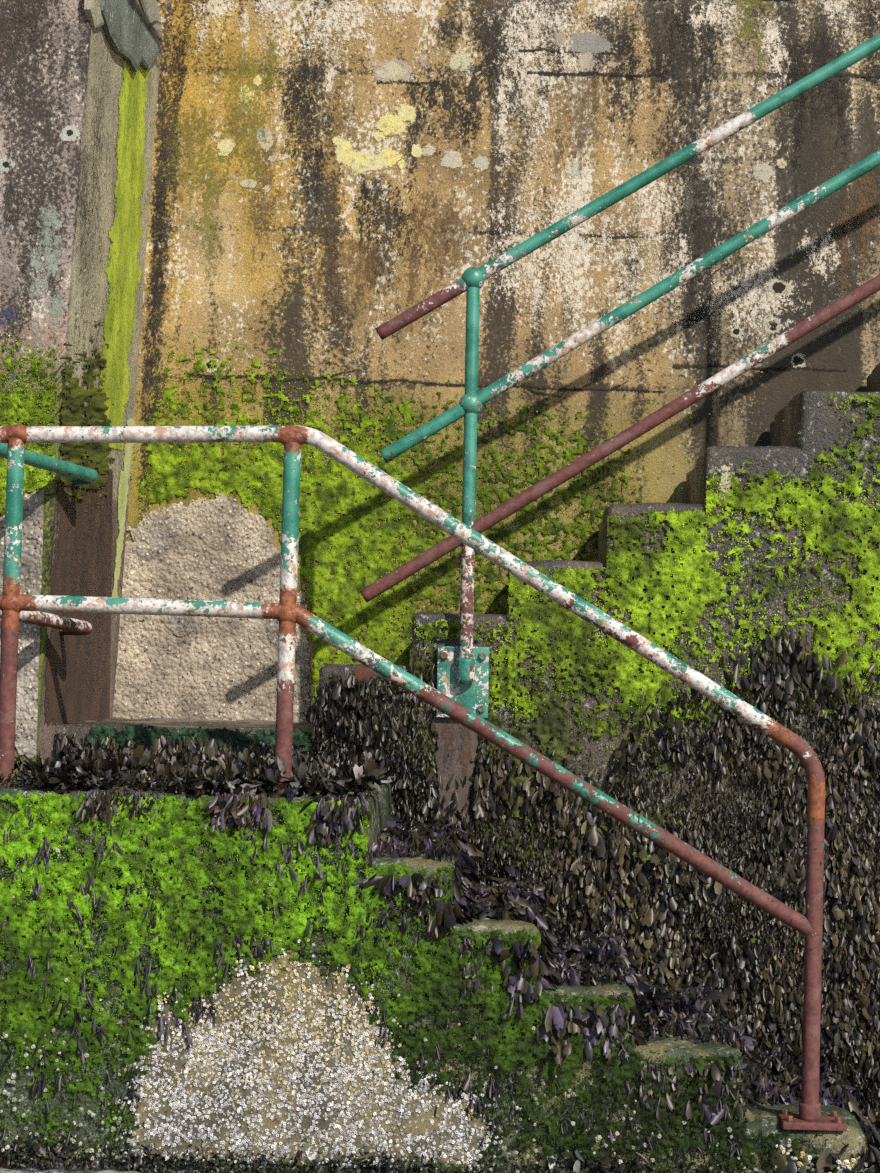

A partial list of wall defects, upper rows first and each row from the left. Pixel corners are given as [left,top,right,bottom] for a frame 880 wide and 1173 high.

leakage [0,0,125,405]
leakage [140,0,298,426]
leakage [248,0,420,279]
leakage [308,0,850,368]
leakage [753,0,880,170]
peeling [15,611,41,759]
peeling [20,489,44,595]
leakage [118,443,155,521]
peeling [113,614,279,721]
peeling [122,493,281,603]
peeling [296,584,307,610]
peeling [293,623,311,723]